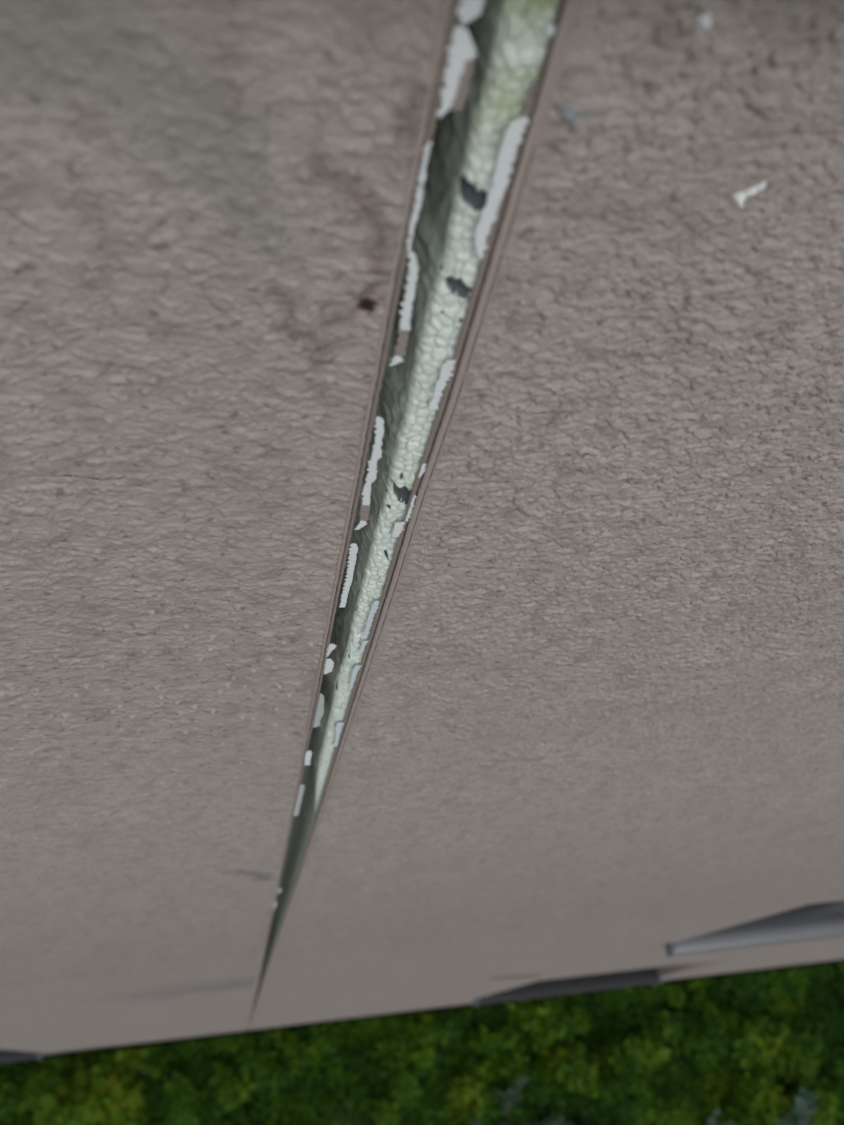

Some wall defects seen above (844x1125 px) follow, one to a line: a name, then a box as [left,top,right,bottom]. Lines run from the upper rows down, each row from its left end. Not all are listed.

peeling [436,0,485,118]
peeling [475,117,529,259]
peeling [389,142,432,366]
peeling [428,360,456,411]
peeling [354,417,384,530]
peeling [392,495,417,537]
peeling [339,544,358,608]
peeling [323,644,337,674]
peeling [349,601,380,688]
peeling [312,694,324,728]
peeling [334,722,344,747]
peeling [293,785,304,816]